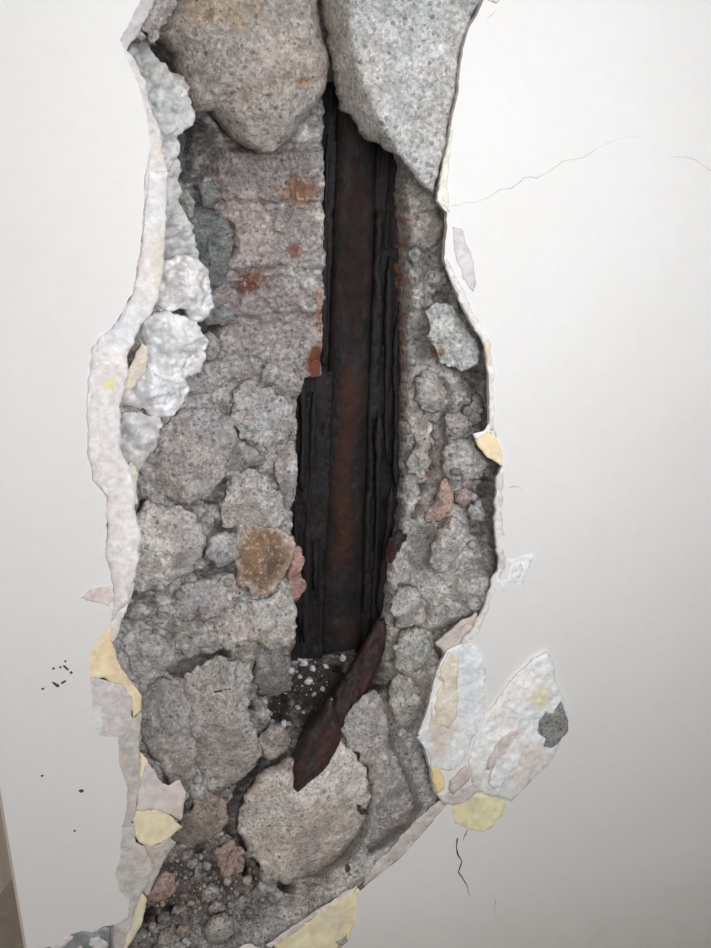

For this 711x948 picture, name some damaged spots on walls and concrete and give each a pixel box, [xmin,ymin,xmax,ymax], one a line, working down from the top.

spalling [120,0,174,172]
rust [289,135,330,376]
spalling [317,0,335,86]
crack [453,136,646,206]
rust [293,384,318,643]
spalling [81,91,568,948]
rust [370,251,413,626]
crack [456,831,470,895]